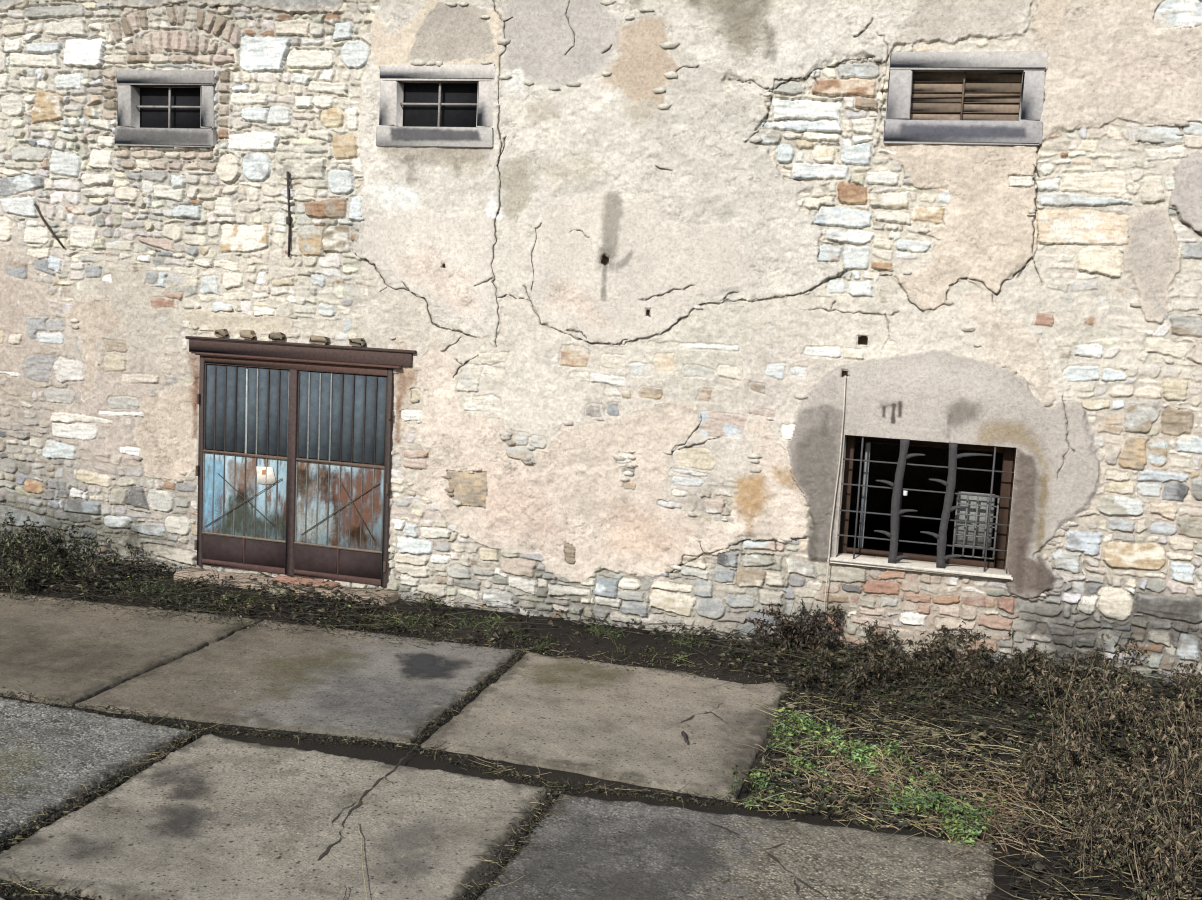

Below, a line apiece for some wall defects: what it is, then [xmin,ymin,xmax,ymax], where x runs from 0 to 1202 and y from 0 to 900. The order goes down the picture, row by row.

spalling [0,0,1202,684]
damp [601,193,621,297]
crack [355,1,888,377]
crack [881,146,1042,312]